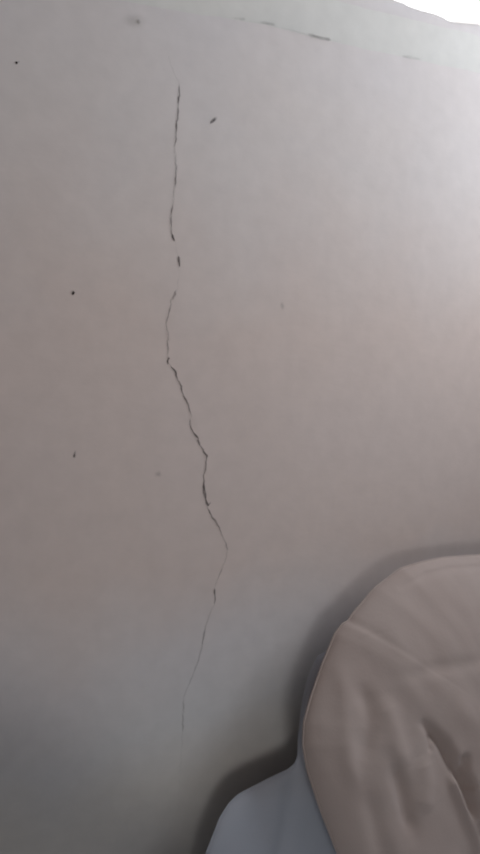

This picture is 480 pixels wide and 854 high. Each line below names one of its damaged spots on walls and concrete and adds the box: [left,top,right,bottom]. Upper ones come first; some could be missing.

crack [167,358,220,529]